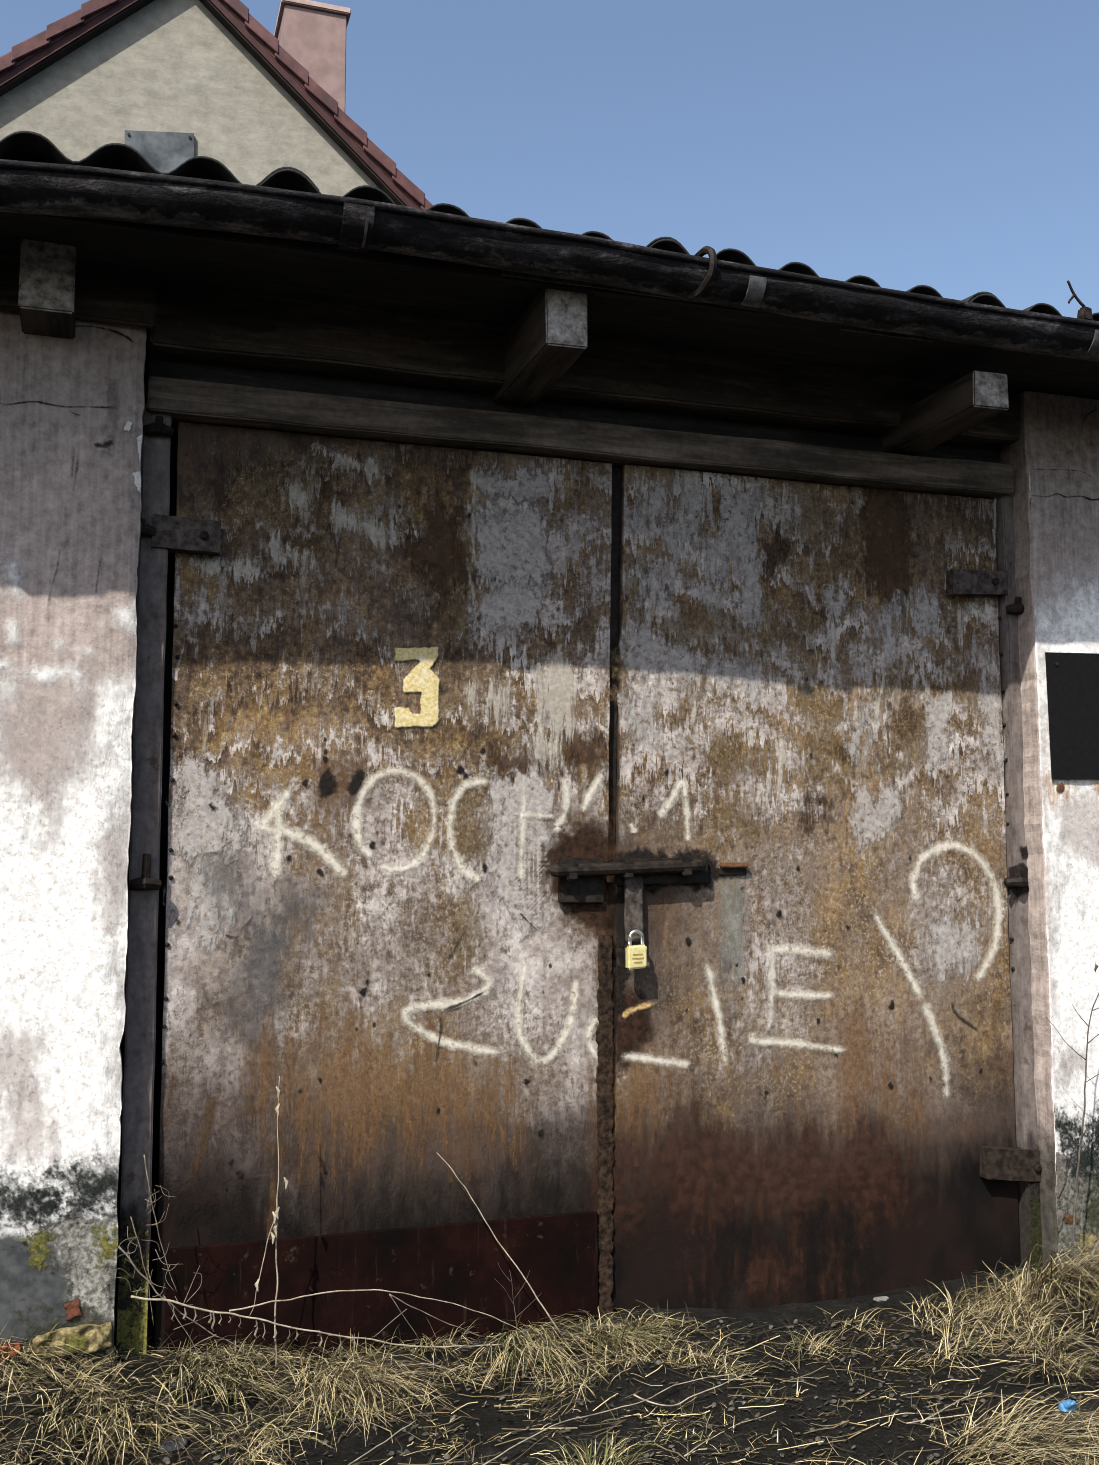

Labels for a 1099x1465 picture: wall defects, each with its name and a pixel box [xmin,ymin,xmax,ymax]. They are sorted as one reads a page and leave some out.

crack [1,401,111,415]
peeling [176,530,314,583]
peeling [458,462,558,640]
peeling [617,478,763,750]
crack [1032,469,1099,500]
peeling [482,646,586,942]
peeling [841,697,901,851]
peeling [925,689,957,776]
peeling [972,637,1006,768]
flaking render [0,1299,113,1367]
leakage [0,1154,150,1368]
leakage [1028,1107,1099,1273]